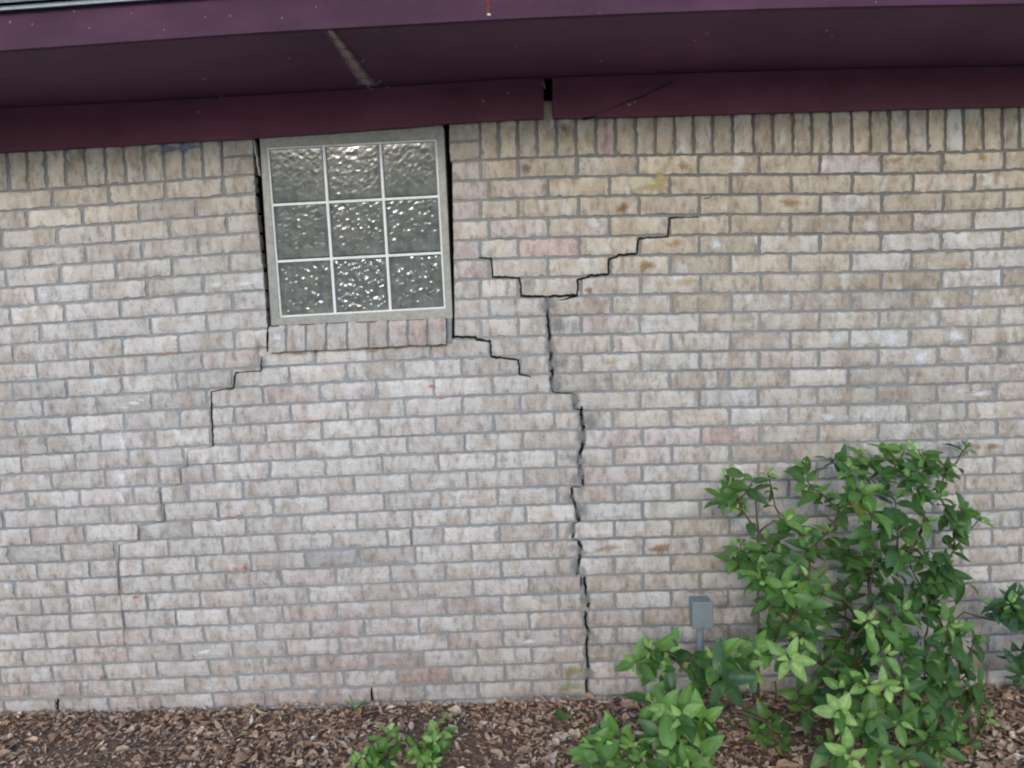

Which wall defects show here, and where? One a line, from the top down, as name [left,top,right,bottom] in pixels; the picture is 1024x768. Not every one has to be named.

crack [117,331,268,644]
crack [452,196,711,693]